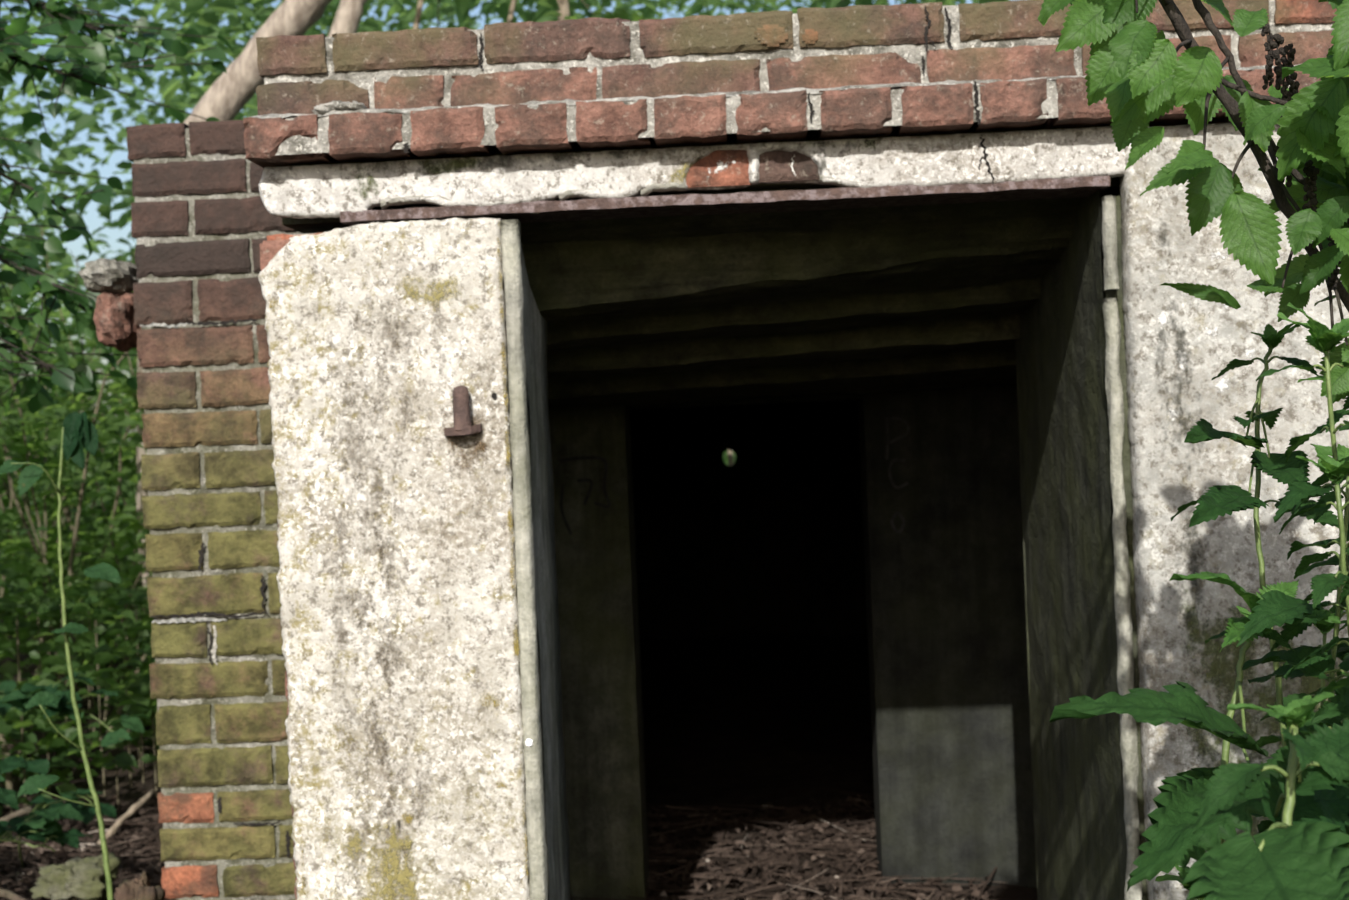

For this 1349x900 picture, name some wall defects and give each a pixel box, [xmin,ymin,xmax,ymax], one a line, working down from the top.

crack [973,81,995,183]
corrosion [443,401,487,473]